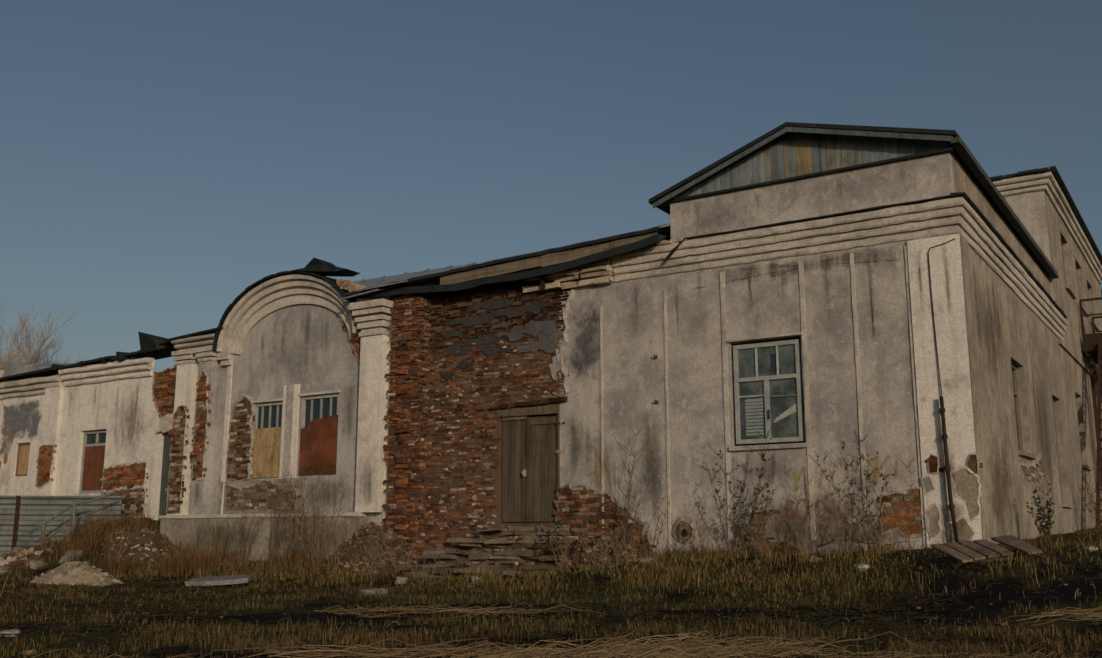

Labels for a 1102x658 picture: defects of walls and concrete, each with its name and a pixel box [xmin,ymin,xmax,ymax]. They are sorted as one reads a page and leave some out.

flaking render [0,403,57,489]
flaking render [100,460,149,519]
flaking render [152,365,211,515]
flaking render [224,393,301,514]
corrosion [299,415,338,467]
flaking render [382,292,563,559]
peeling [876,453,983,543]